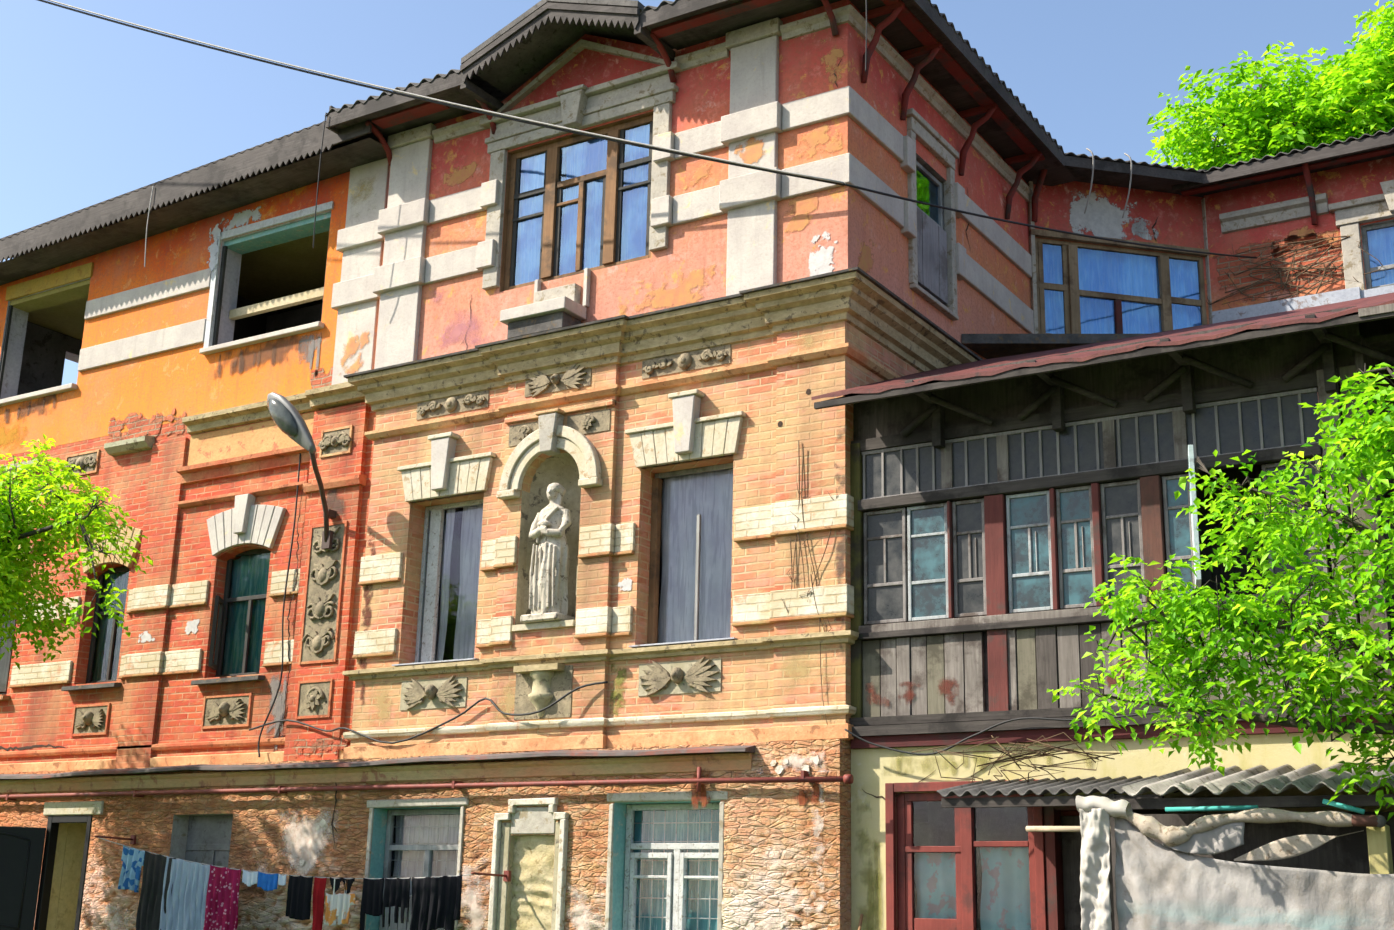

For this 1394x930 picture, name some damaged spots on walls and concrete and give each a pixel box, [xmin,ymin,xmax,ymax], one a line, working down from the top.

peeling [784,195,837,276]
peeling [1069,191,1159,240]
spalling [1212,226,1344,301]
spalling [108,408,186,442]
rust [691,770,710,807]
water stain [861,871,881,930]